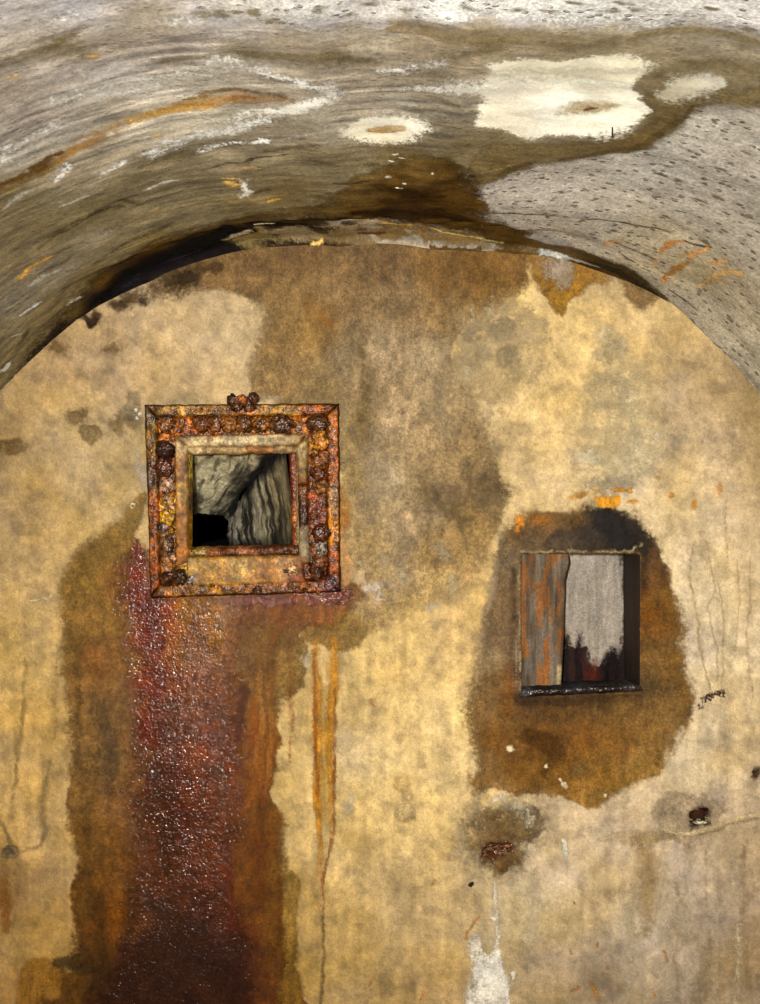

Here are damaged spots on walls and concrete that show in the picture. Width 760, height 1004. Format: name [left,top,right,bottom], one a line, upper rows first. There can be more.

water stain [0,123,57,163]
water stain [49,20,537,169]
water stain [16,53,760,374]
rust [661,247,709,282]
water stain [632,27,757,45]
rust [515,515,551,532]
rust [570,487,638,509]
water stain [152,223,695,1004]
water stain [41,493,155,1004]
rust [87,487,354,1004]
spalling [452,798,548,881]
spalling [624,792,724,934]